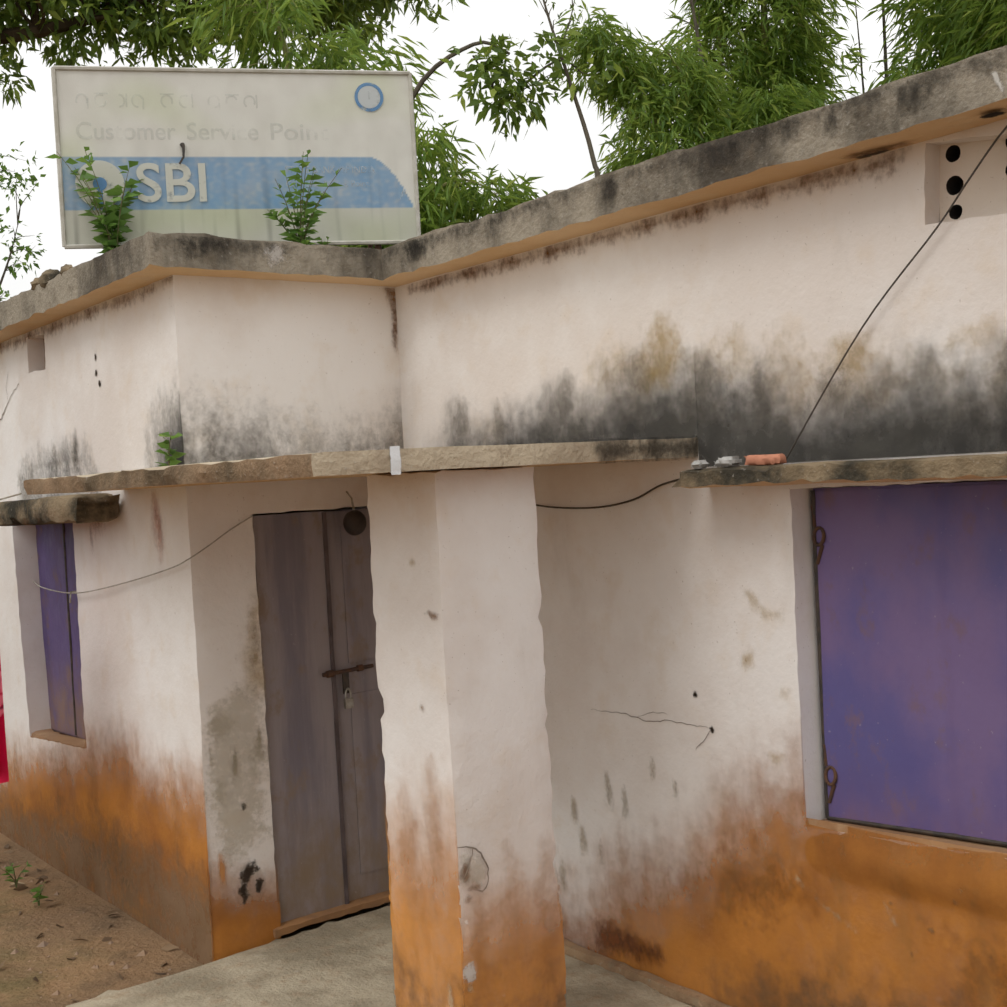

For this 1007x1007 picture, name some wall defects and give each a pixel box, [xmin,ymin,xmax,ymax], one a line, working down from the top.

damp [404,228,459,260]
damp [544,236,598,258]
damp [421,267,487,289]
damp [451,371,1007,467]
damp [165,432,184,465]
crack [591,709,710,749]